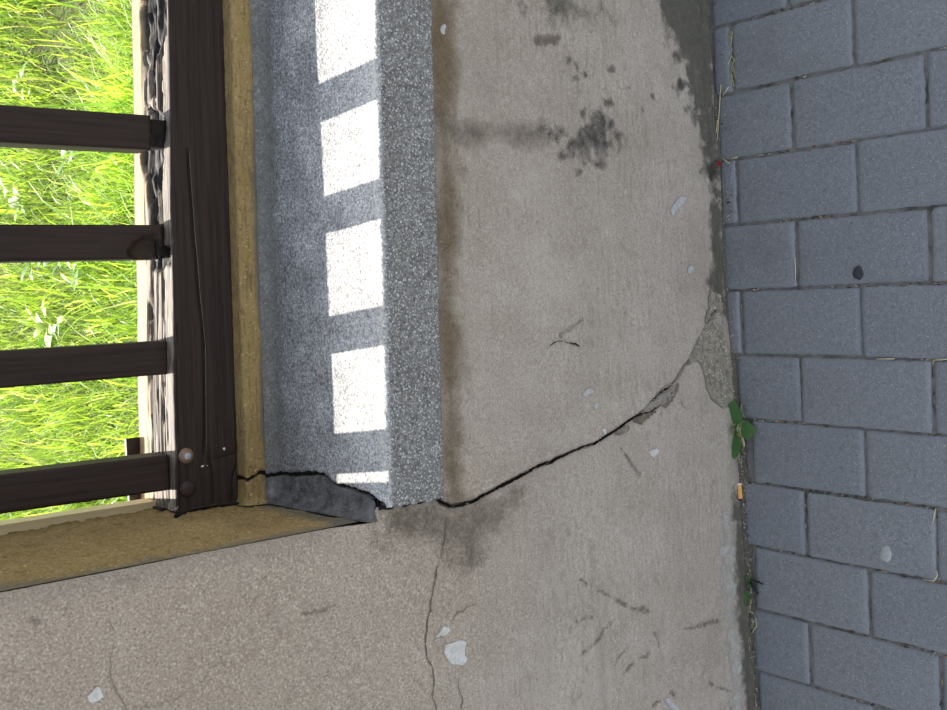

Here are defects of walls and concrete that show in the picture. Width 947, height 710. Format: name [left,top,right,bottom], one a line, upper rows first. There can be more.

water stain [561,100,619,158]
crack [247,363,686,710]